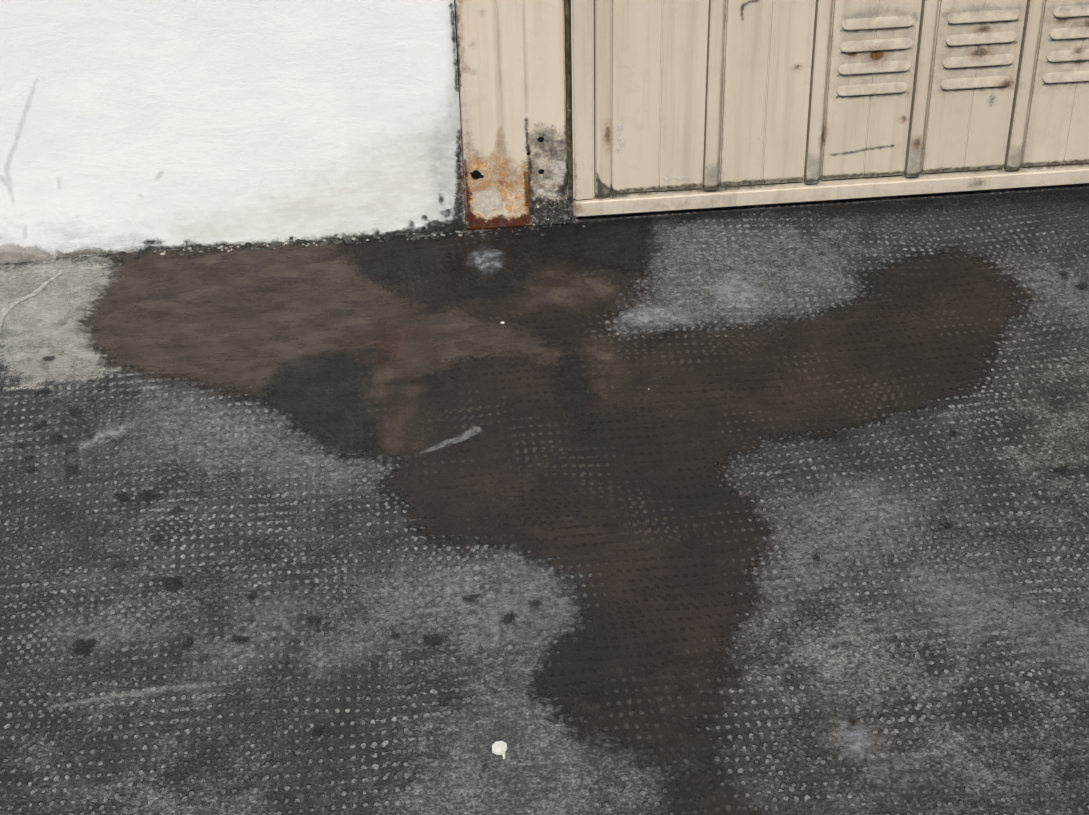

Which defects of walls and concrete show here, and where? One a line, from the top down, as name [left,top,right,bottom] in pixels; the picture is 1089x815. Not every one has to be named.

water stain [449,3,461,91]
corrosion [462,135,536,231]
water stain [79,129,1089,815]
water stain [31,605,167,664]